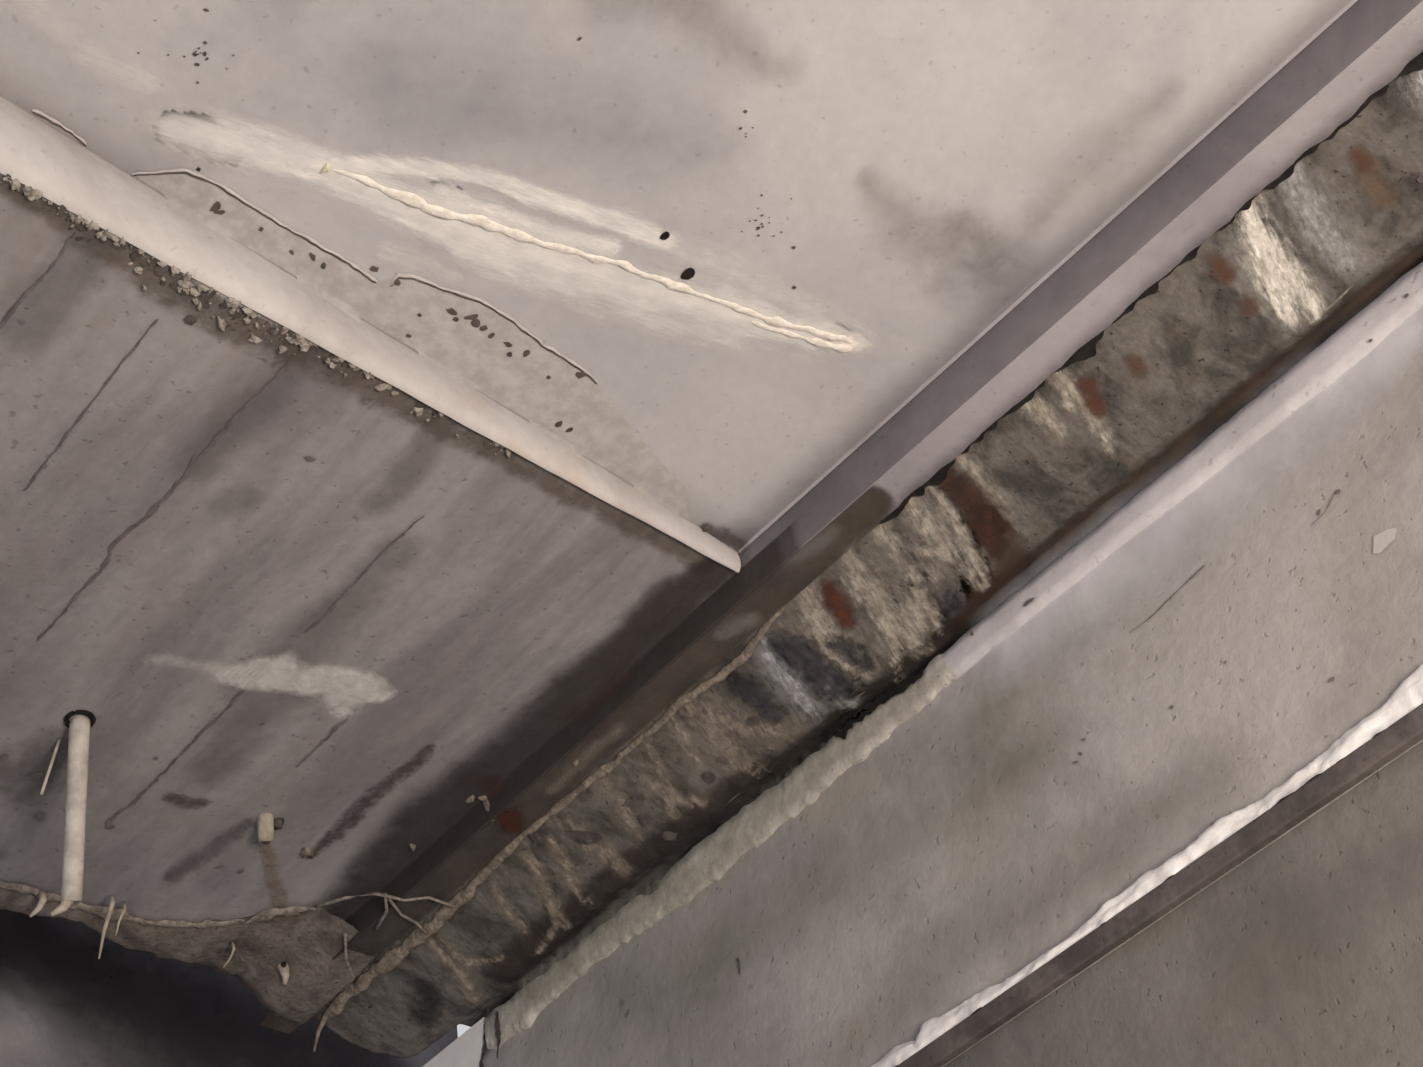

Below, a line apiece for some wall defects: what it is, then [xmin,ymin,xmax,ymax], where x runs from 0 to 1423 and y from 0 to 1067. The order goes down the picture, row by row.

leakage [156,114,867,353]
leakage [1242,207,1352,326]
crack [24,319,158,491]
crack [38,353,299,641]
leakage [0,244,1423,1067]
corrosion [823,582,854,628]
peeling [1373,528,1397,554]
crack [105,688,247,826]
peeling [573,669,924,964]